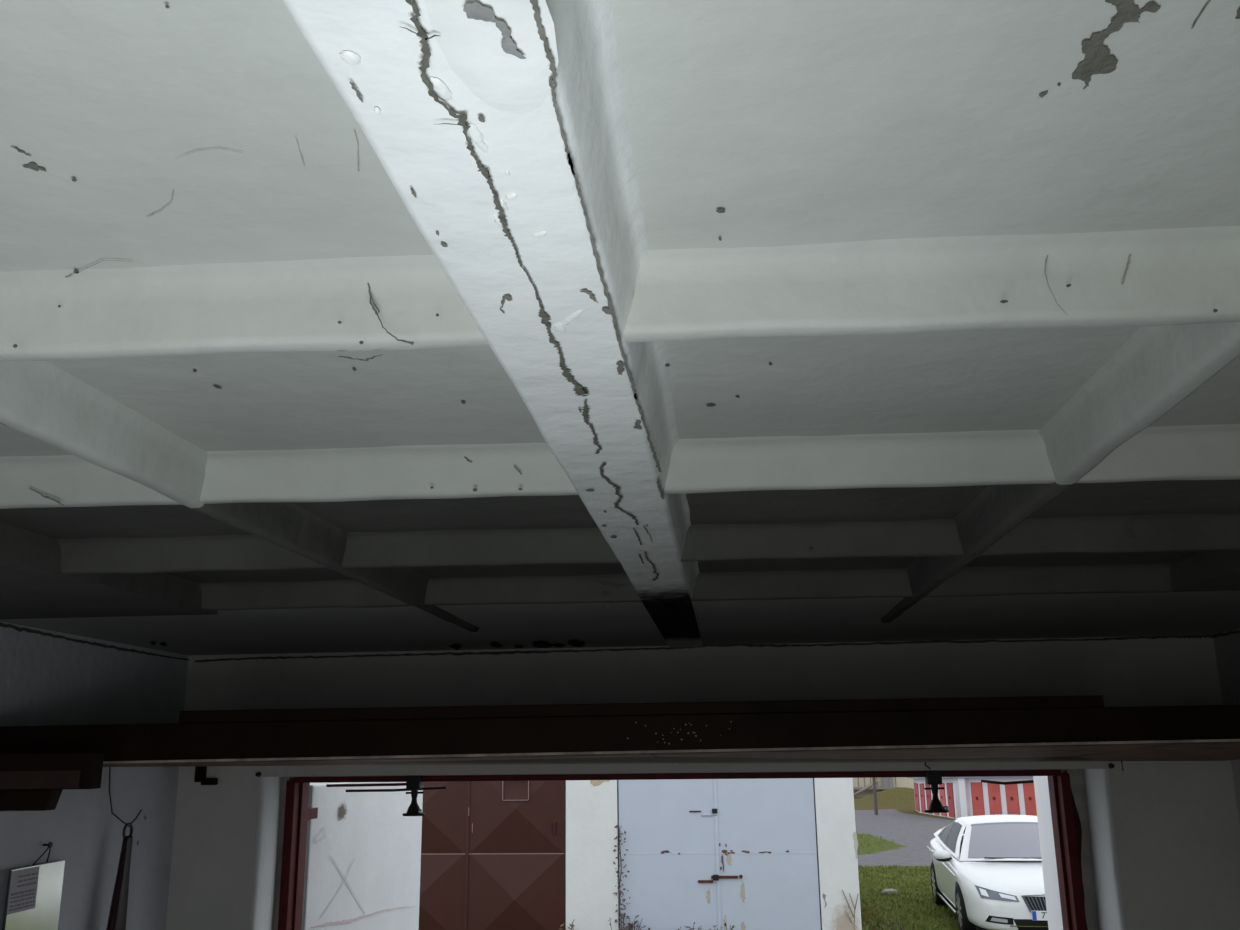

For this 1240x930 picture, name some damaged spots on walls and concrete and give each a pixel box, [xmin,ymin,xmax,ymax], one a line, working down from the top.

peeling [463,1,526,59]
peeling [1039,0,1161,98]
peeling [11,146,46,172]
crack [367,283,414,345]
crack [399,0,665,581]